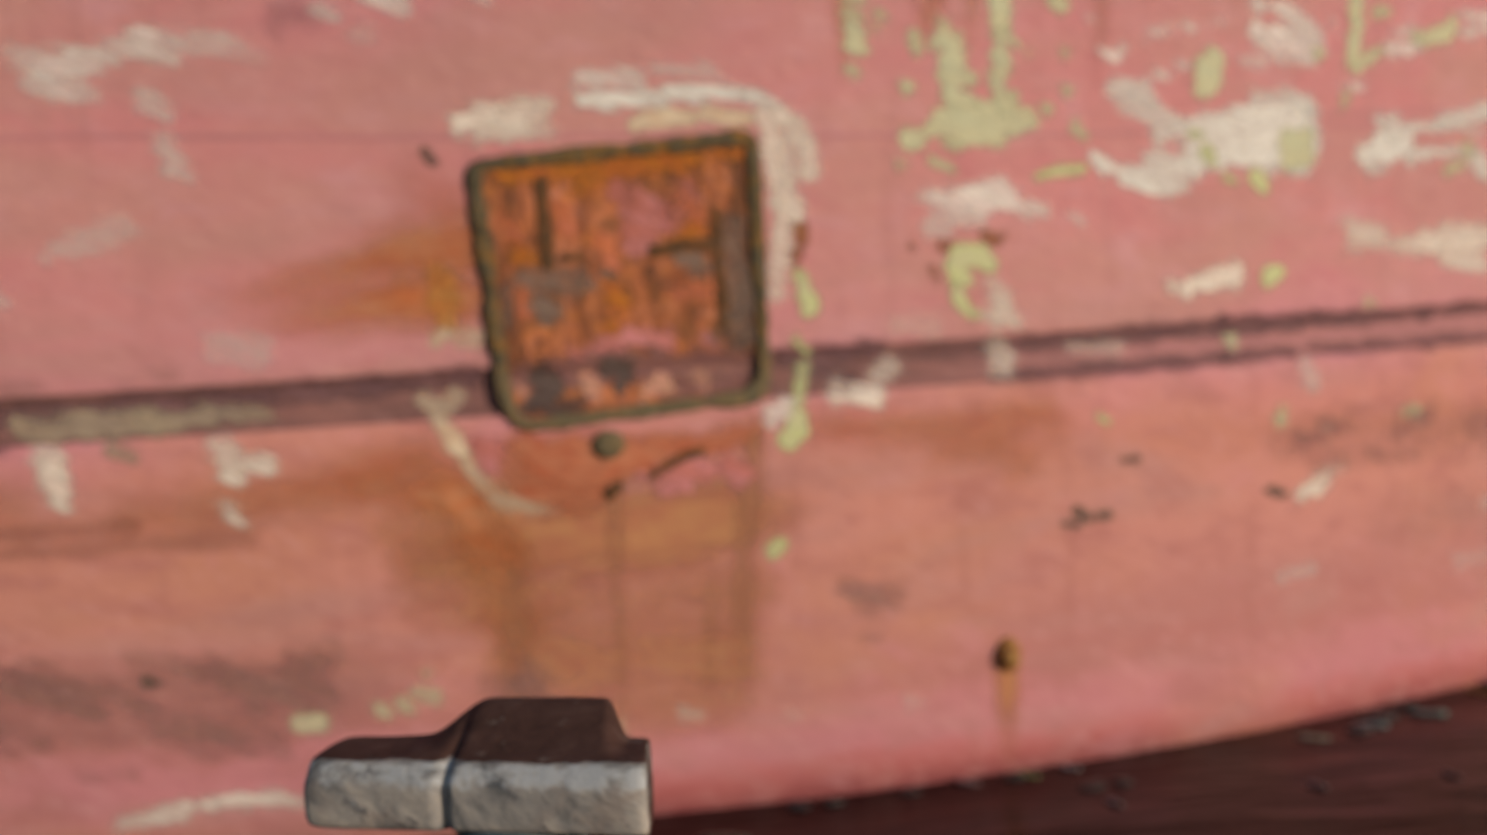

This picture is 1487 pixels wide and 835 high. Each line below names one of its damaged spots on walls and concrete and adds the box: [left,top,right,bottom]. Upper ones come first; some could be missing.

peeling [1341,0,1487,93]
peeling [447,96,556,143]
corrosion [493,146,745,186]
peeling [573,64,821,318]
peeling [898,0,1073,318]
peeling [1034,43,1321,197]
peeling [1354,101,1487,181]
corrosion [329,225,483,320]
peeling [568,324,677,404]
corrosion [496,344,766,526]
peeling [762,336,811,451]
corrosion [404,467,504,565]